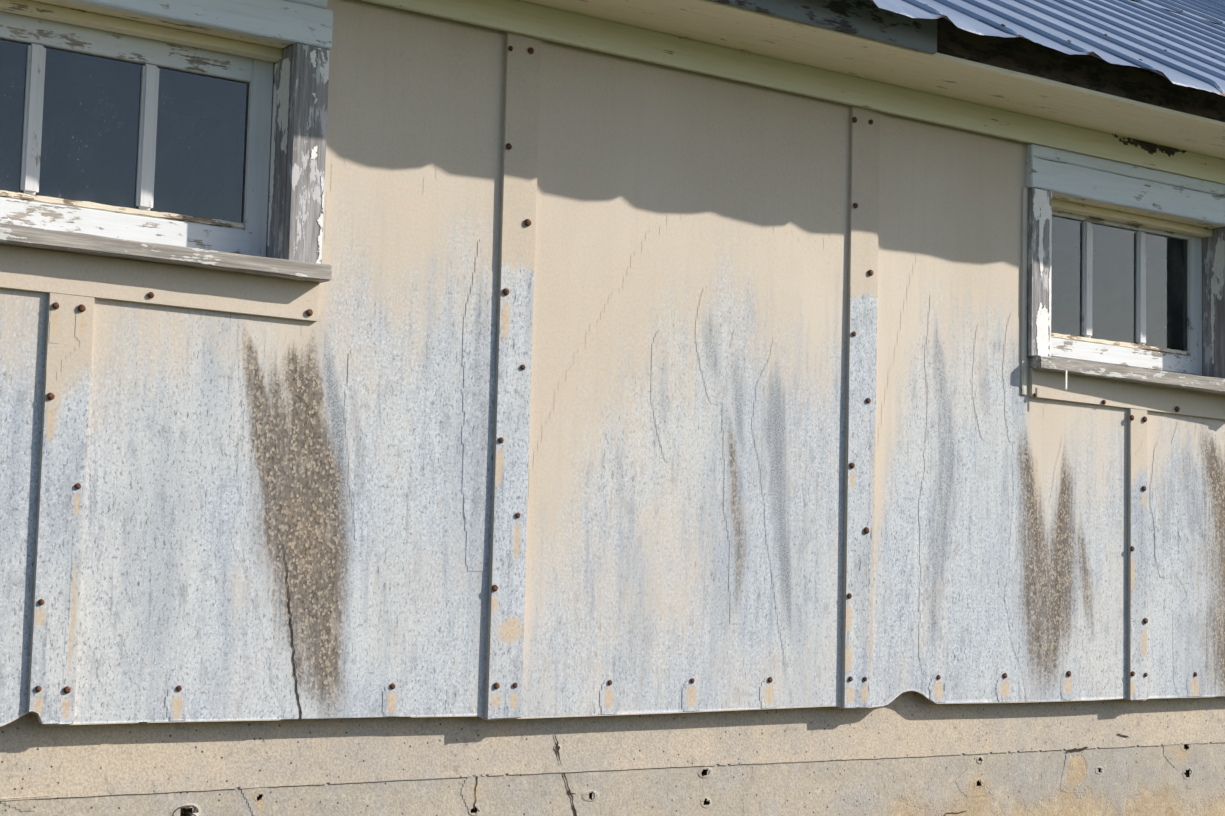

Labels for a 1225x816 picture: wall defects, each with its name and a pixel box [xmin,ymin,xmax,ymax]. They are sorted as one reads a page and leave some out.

peeling [267,58,290,247]
water stain [231,311,374,719]
water stain [461,239,497,571]
peeling [0,143,1033,726]
water stain [919,294,1102,701]
peeling [1022,188,1225,701]
water stain [1150,417,1225,697]
crack [555,735,577,816]
spalling [581,790,600,802]
spalling [697,766,713,779]
spalling [700,797,712,809]
spalling [974,756,984,789]